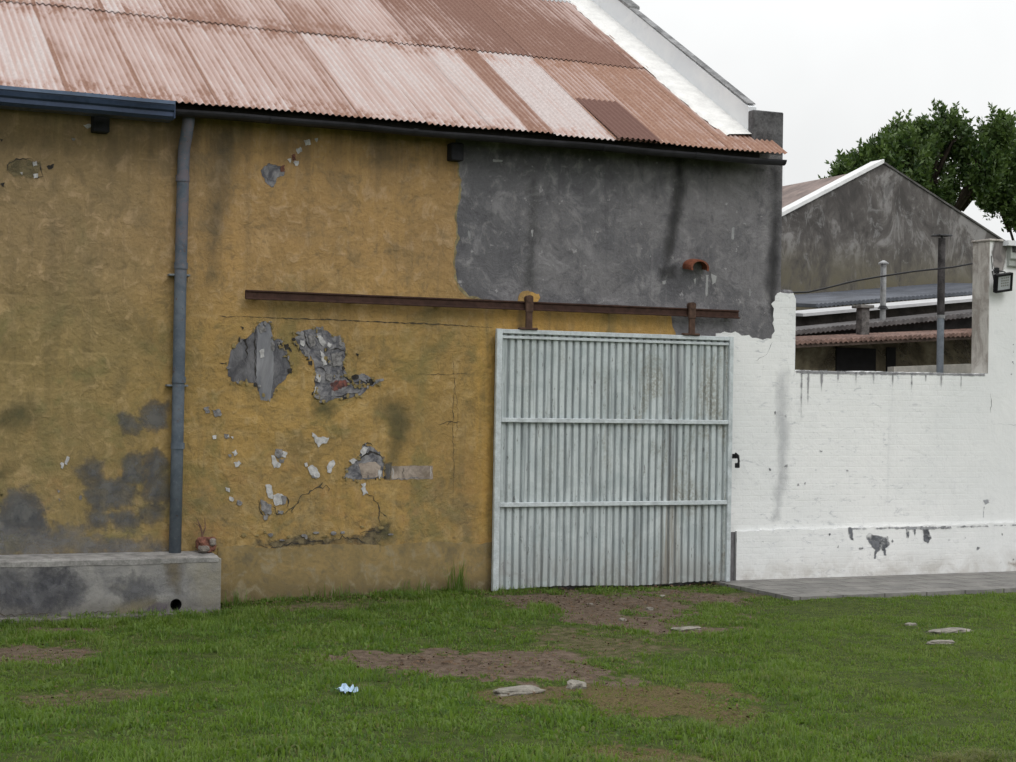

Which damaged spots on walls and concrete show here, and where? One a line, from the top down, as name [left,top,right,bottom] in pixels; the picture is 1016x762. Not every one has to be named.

flaking render [7,158,54,179]
flaking render [261,138,318,187]
flaking render [221,321,384,404]
leakage [0,491,167,555]
leakage [78,450,170,527]
leakage [119,403,168,432]
peeling [271,449,287,468]
crack [282,482,330,515]
flaking render [241,484,394,548]
peeling [312,433,329,448]
flaking render [304,442,387,495]
leakage [0,569,83,612]